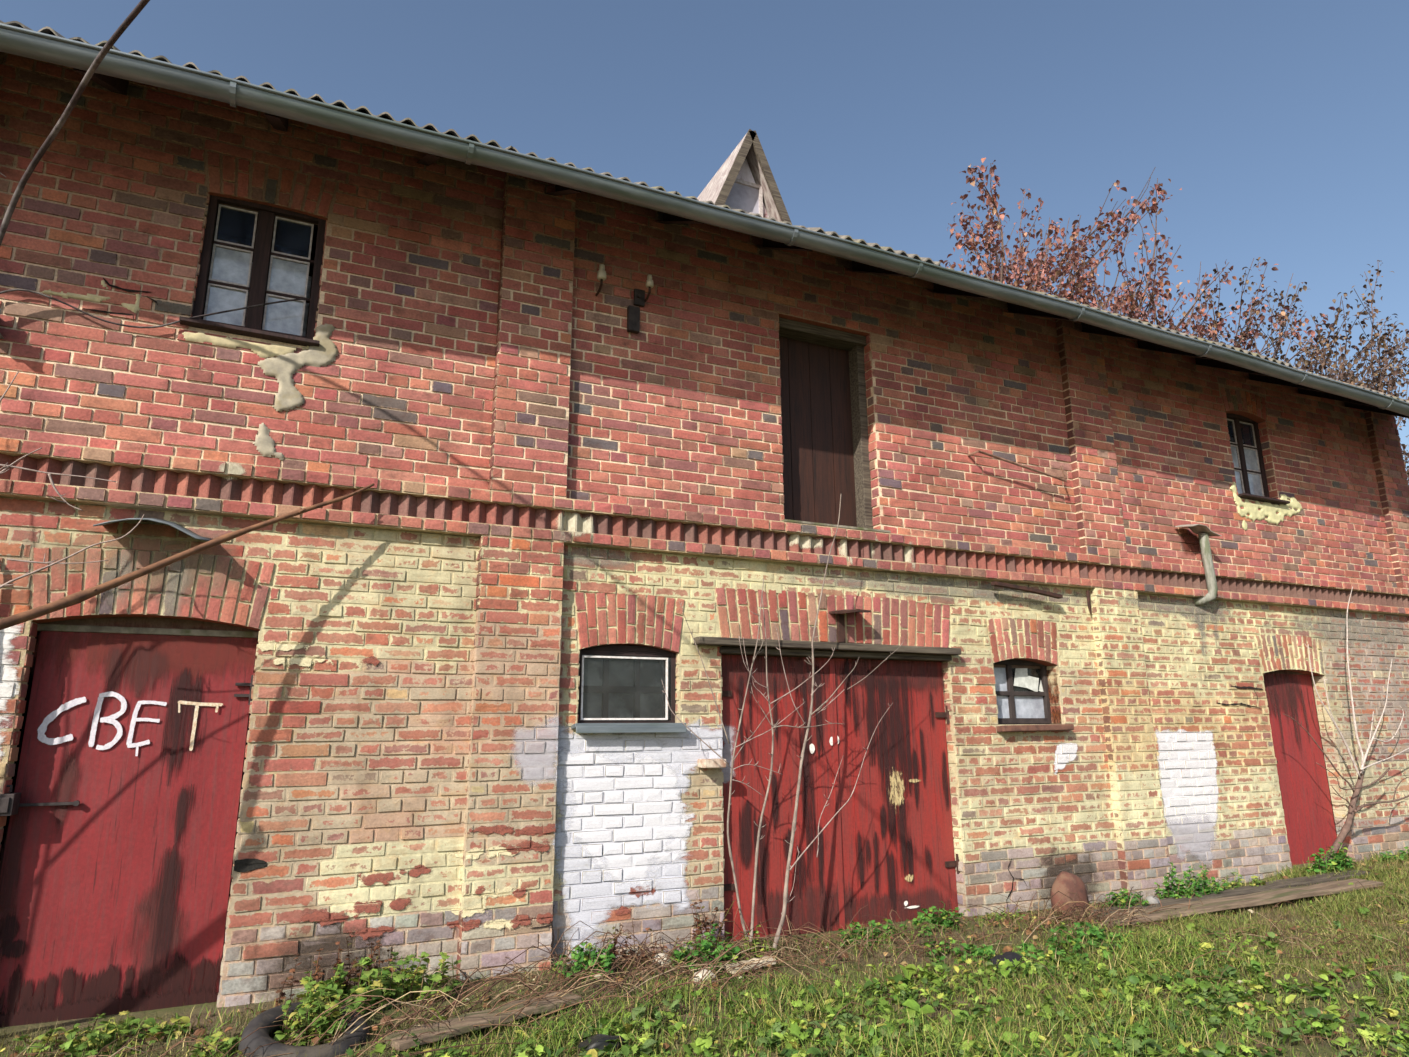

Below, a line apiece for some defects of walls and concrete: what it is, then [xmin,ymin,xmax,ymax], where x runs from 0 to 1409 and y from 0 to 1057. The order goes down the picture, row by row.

spalling [614,886,656,916]
peeling [0,915,27,958]